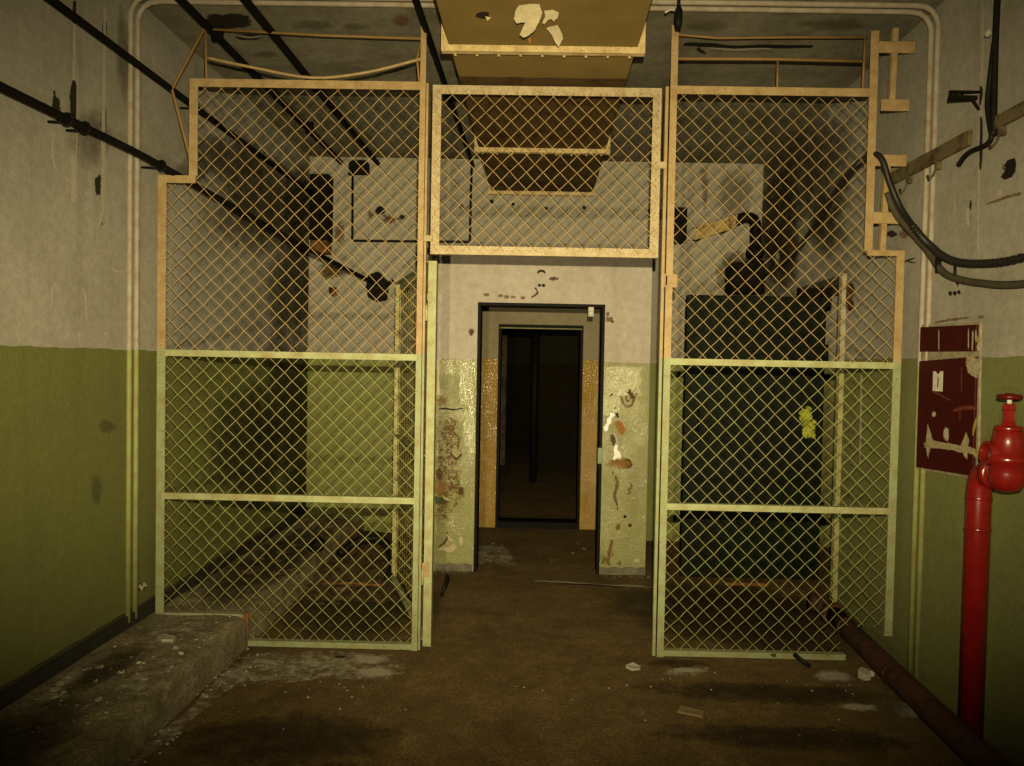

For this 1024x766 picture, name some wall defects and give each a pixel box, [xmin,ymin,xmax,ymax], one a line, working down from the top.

peeling [514,4,563,47]
peeling [603,407,626,460]
flaking render [435,532,472,571]